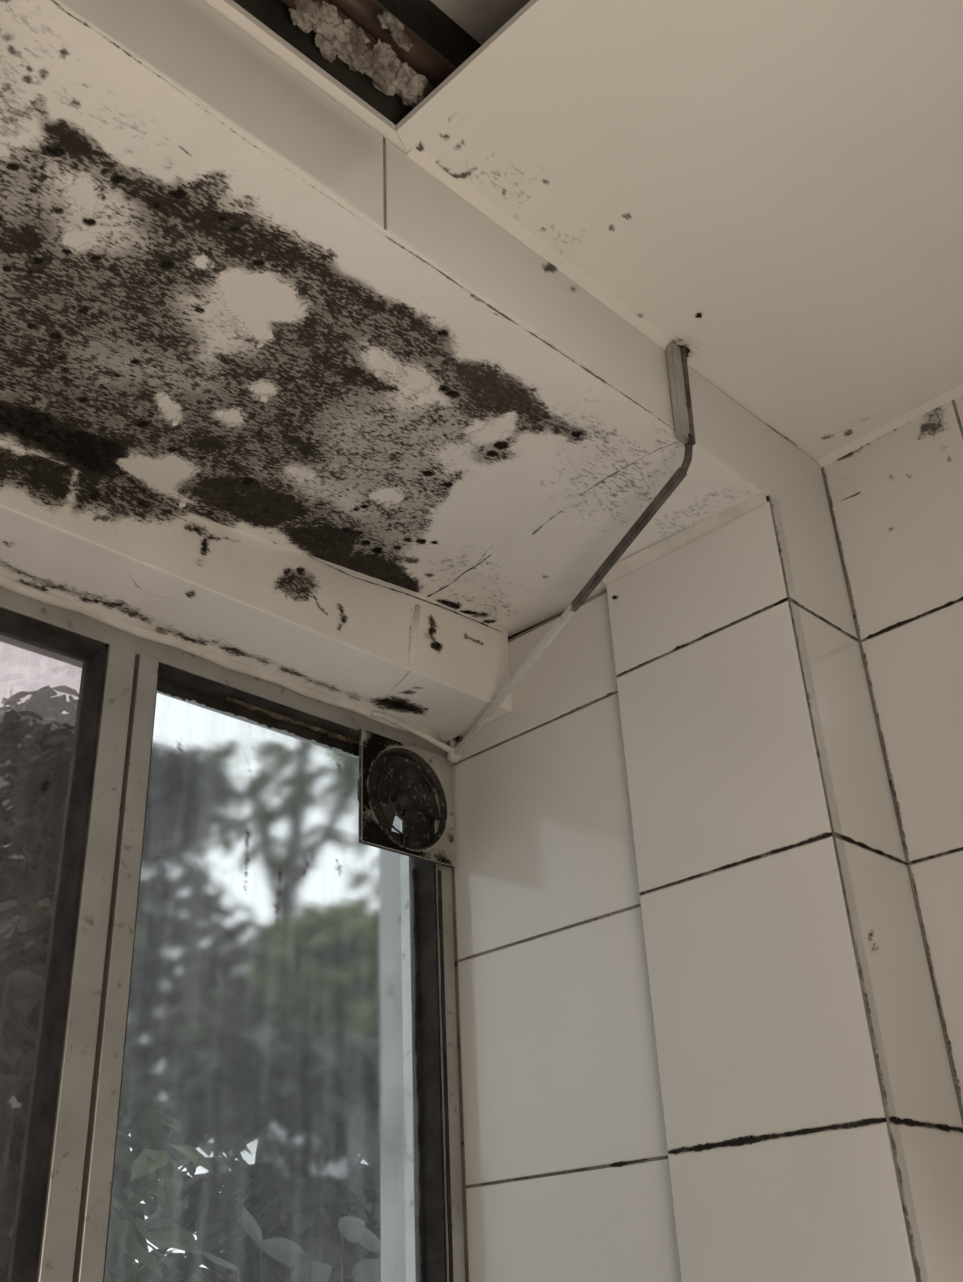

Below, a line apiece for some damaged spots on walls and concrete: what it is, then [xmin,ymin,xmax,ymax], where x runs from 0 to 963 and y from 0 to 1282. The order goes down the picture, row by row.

leakage [0,66,591,631]
leakage [0,561,428,715]
leakage [424,594,507,651]